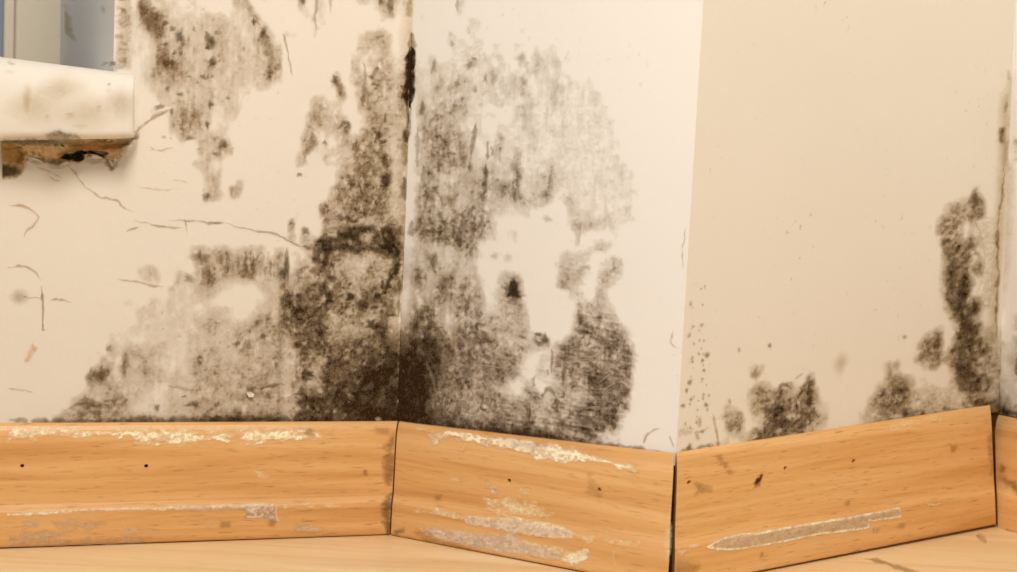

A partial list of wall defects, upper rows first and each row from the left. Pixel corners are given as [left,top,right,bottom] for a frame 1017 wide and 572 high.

leakage [139,2,182,90]
leakage [403,35,415,142]
leakage [3,131,81,145]
spalling [1,131,138,179]
leakage [187,80,632,443]
leakage [924,194,1017,417]
leakage [77,366,175,422]
leakage [755,381,818,440]
leakage [873,380,924,418]